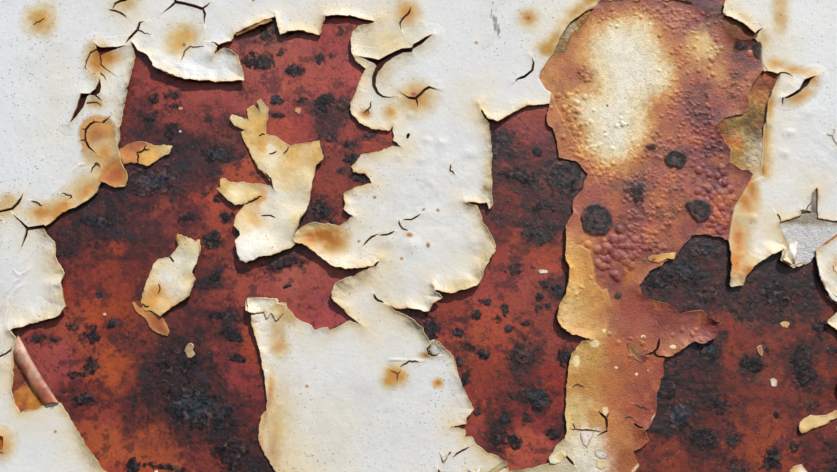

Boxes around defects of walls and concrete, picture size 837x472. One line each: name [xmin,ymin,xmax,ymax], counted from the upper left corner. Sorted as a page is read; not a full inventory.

crack [72,0,149,172]
crack [166,0,209,23]
crack [361,36,434,112]
peeling [688,0,757,40]
crack [0,197,48,246]
rust [0,98,127,225]
peeling [11,15,400,472]
rust [299,224,348,254]
peeling [392,104,589,472]
rust [538,0,819,472]
peeling [634,189,837,472]
rust [258,376,281,472]